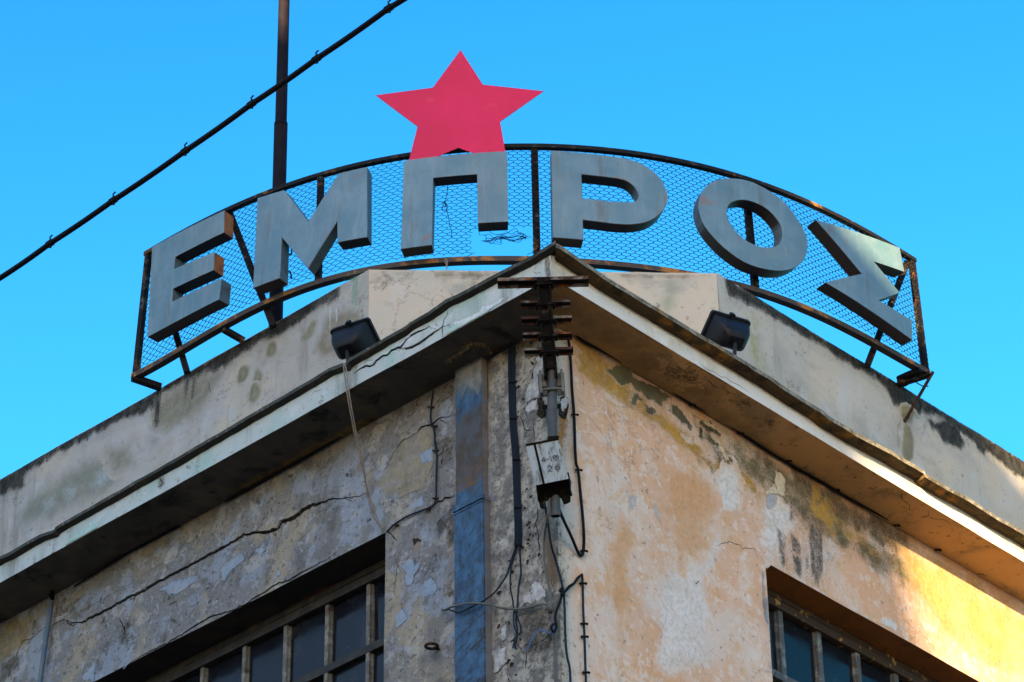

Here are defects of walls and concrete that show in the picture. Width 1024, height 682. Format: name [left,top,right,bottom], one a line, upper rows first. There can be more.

peeling [31,568,115,634]
peeling [140,531,175,556]
peeling [160,574,200,596]
leakage [0,277,362,554]
crack [10,410,453,669]
peeling [220,546,266,582]
crack [353,309,450,373]
peeling [571,339,786,682]
leakage [552,287,914,590]
leakage [724,278,1024,482]